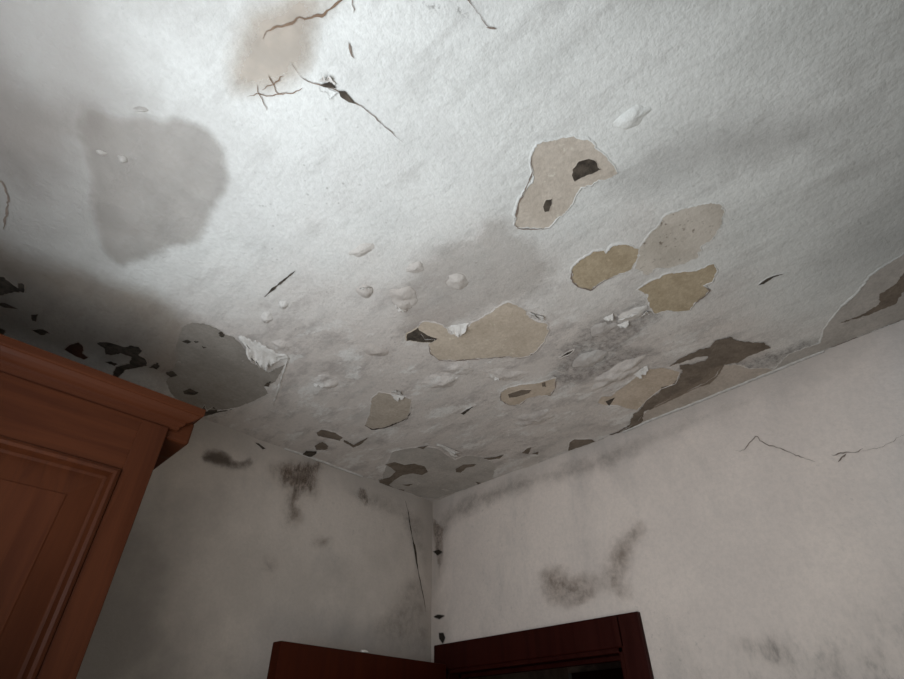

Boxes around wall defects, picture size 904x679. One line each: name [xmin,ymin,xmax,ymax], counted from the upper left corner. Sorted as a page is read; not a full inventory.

water stain [244,5,305,80]
crack [263,0,355,38]
crack [248,62,400,140]
peeling [512,134,619,230]
peeling [569,201,726,328]
peeling [96,323,289,418]
peeling [303,391,412,457]
peeling [378,443,503,499]
peeling [405,300,550,361]
peeling [489,373,557,406]
peeling [567,252,904,451]
crack [741,435,903,462]